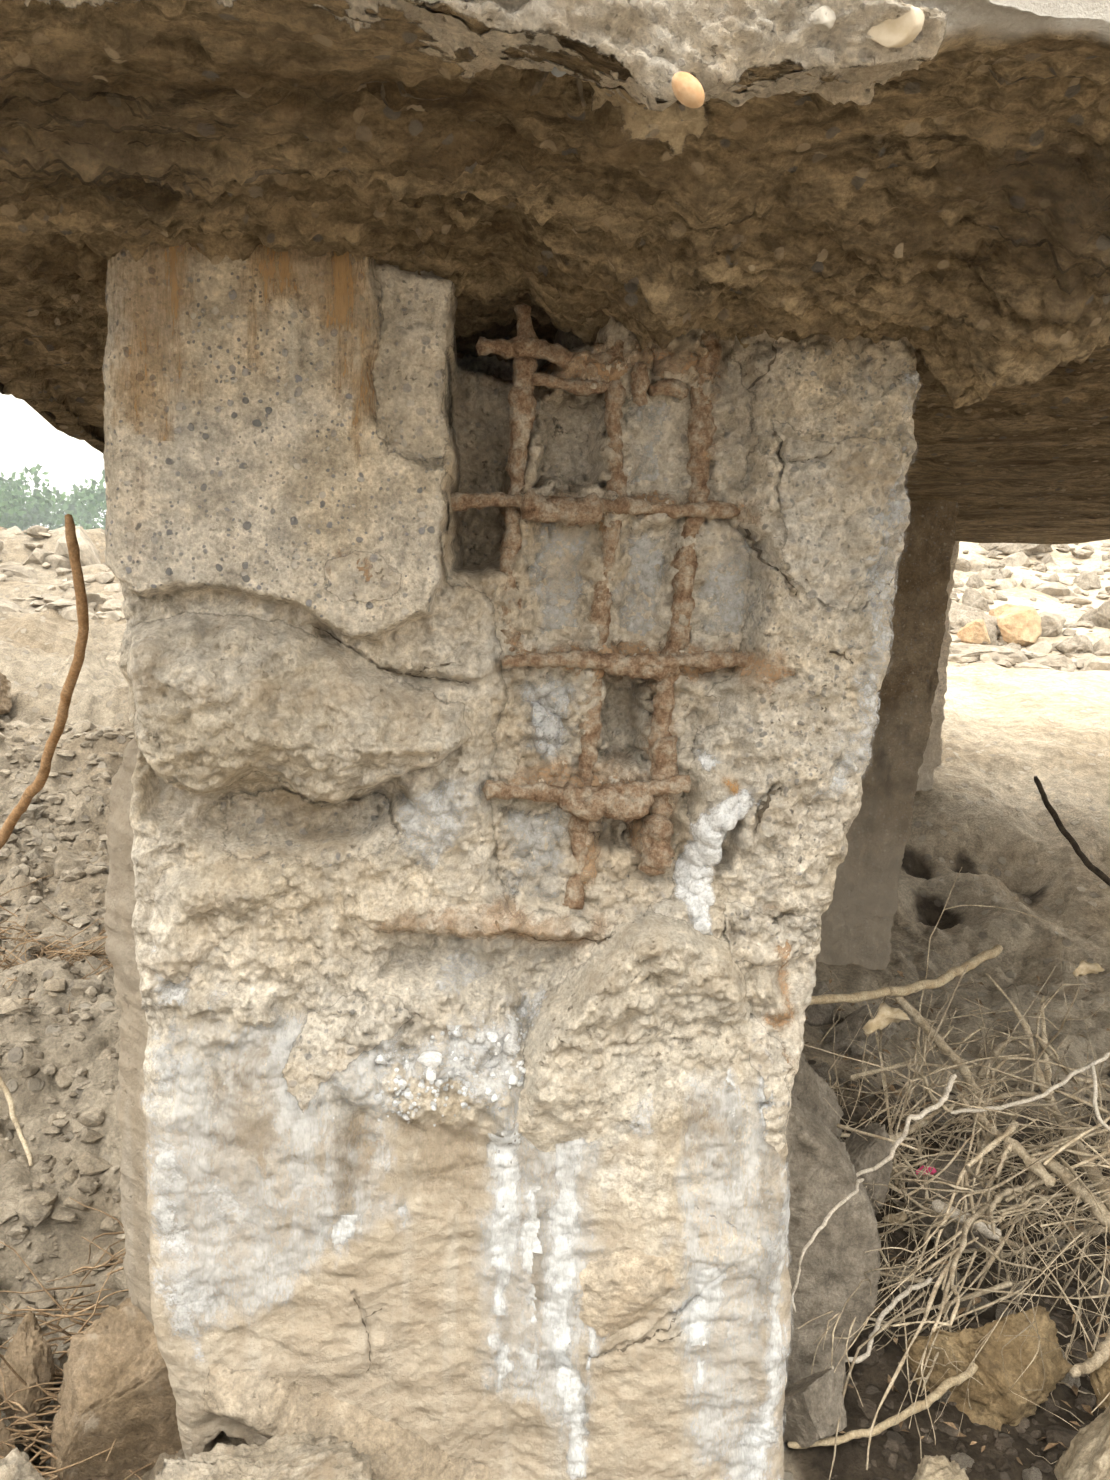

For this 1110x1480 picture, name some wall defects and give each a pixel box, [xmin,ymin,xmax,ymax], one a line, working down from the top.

spalling [13,0,140,8]
spalling [314,0,948,156]
rust [537,340,721,389]
crack [372,662,469,684]
rust [511,641,661,681]
spalling [363,257,903,927]
rust [676,644,795,692]
water stain [672,789,753,935]
water stain [142,1037,241,1361]
water stain [224,991,545,1303]
water stain [421,1110,596,1480]
crack [588,1308,690,1360]